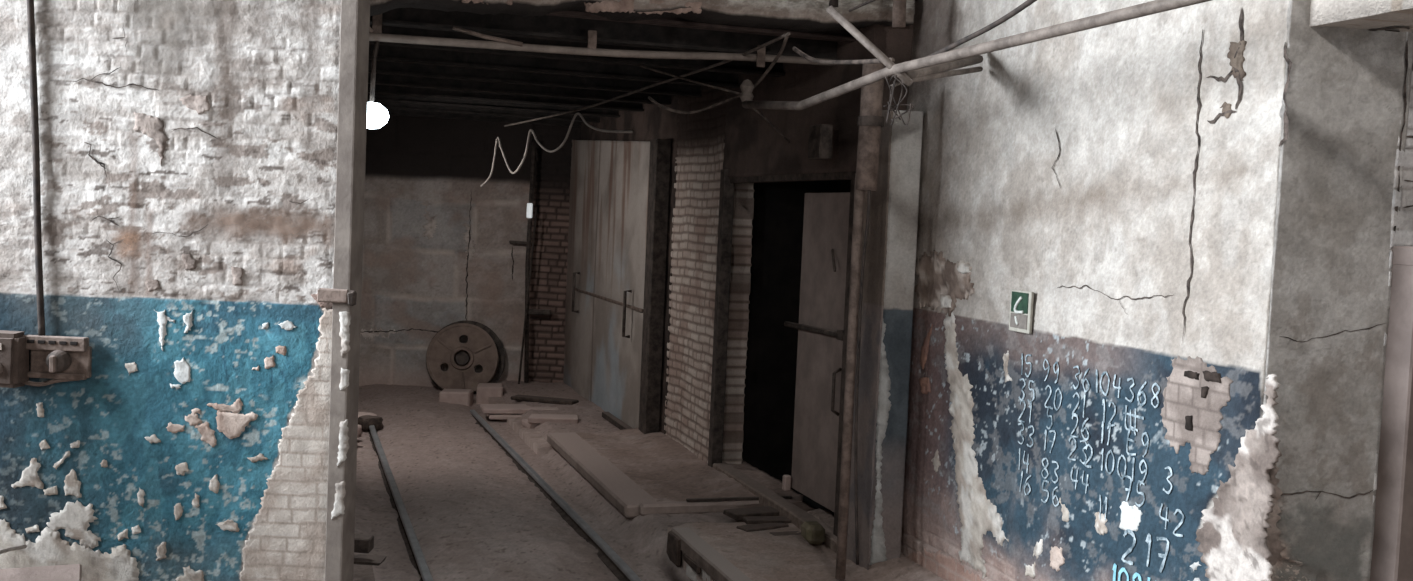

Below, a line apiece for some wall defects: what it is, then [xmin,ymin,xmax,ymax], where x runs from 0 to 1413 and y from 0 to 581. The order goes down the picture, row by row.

crack [72,24,158,90]
crack [173,127,218,139]
crack [1057,8,1243,341]
peeling [154,309,194,389]
crack [1285,323,1385,342]
peeling [145,398,258,447]
flaking render [216,294,351,581]
flaking render [914,250,1009,579]
spalling [1160,356,1310,581]
peeling [0,440,141,581]
peeling [1095,501,1142,535]
peeling [1025,539,1065,579]